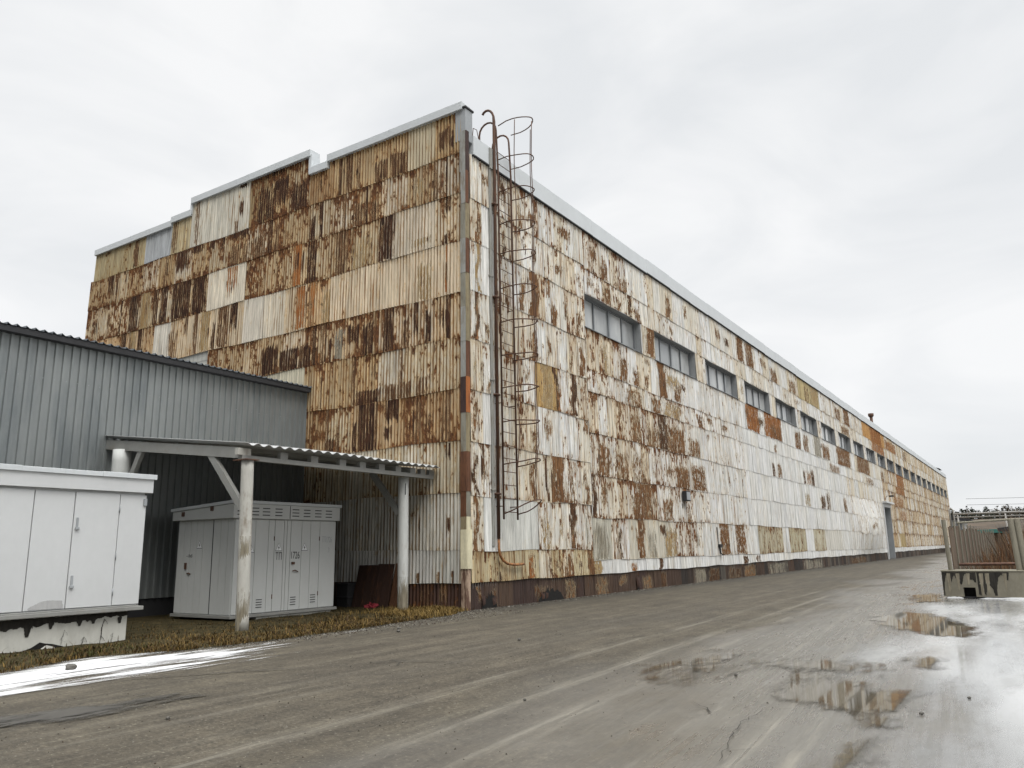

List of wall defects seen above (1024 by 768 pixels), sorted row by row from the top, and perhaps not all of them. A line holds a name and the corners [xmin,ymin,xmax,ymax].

rust [335,127,456,274]
rust [92,168,332,377]
rust [470,212,489,344]
rust [320,234,451,460]
rust [471,356,495,551]
rust [504,208,727,602]
rust [740,384,782,478]
rust [715,328,818,407]
rust [821,427,907,521]
damp [0,611,128,637]
rust [710,523,762,581]
damp [942,572,1009,596]